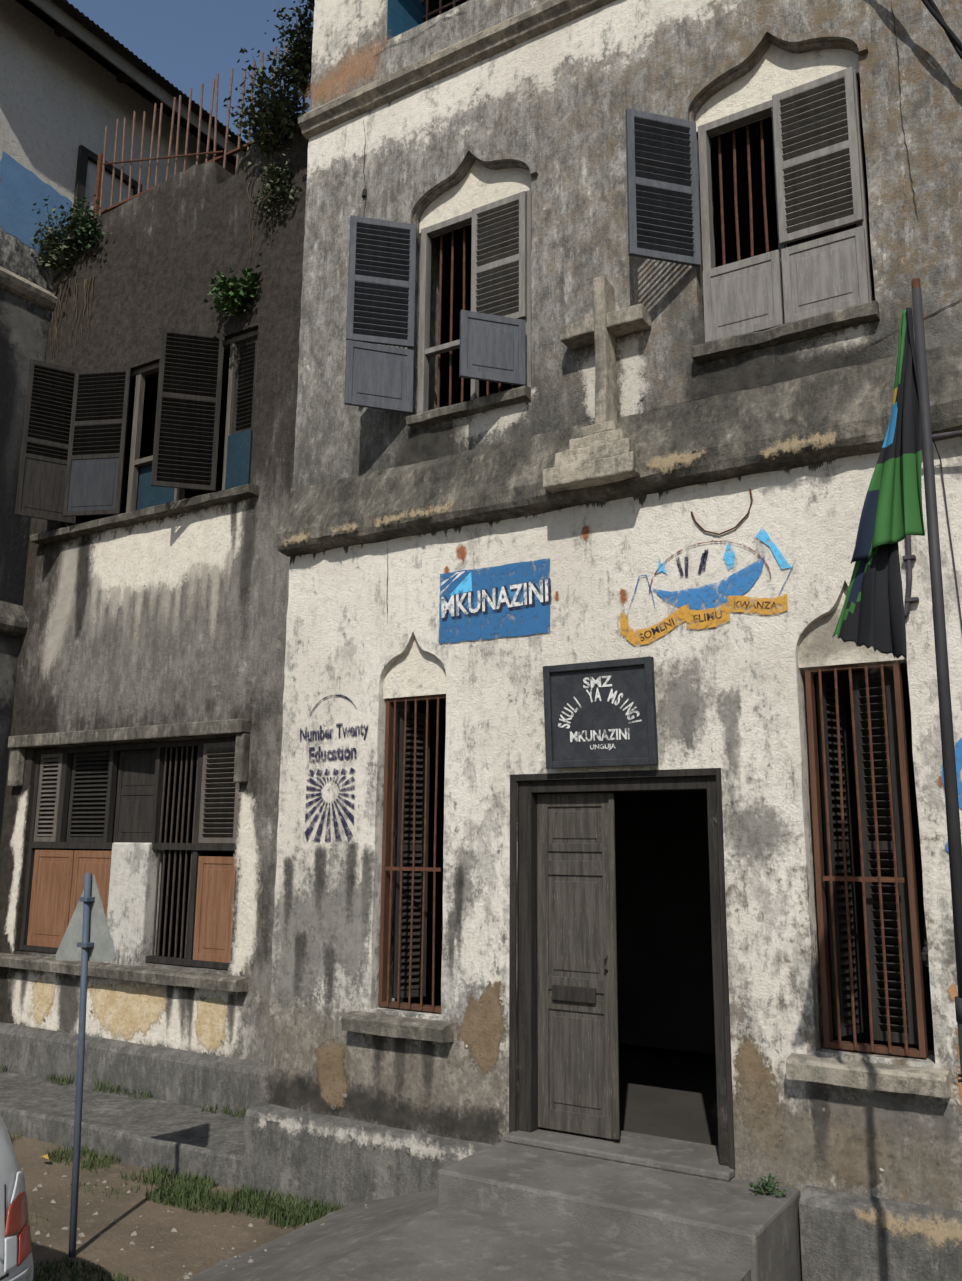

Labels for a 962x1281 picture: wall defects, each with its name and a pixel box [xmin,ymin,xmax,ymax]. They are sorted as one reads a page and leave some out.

crack [891,3,918,216]
water stain [42,536,90,675]
water stain [231,502,256,626]
peeling [5,791,27,951]
peeling [9,793,260,1057]
water stain [269,843,377,1008]
water stain [446,848,474,964]
peeling [315,1038,350,1110]
peeling [258,1115,473,1160]
water stain [268,1035,503,1144]
peeling [457,981,505,1076]
peeling [855,1208,962,1247]